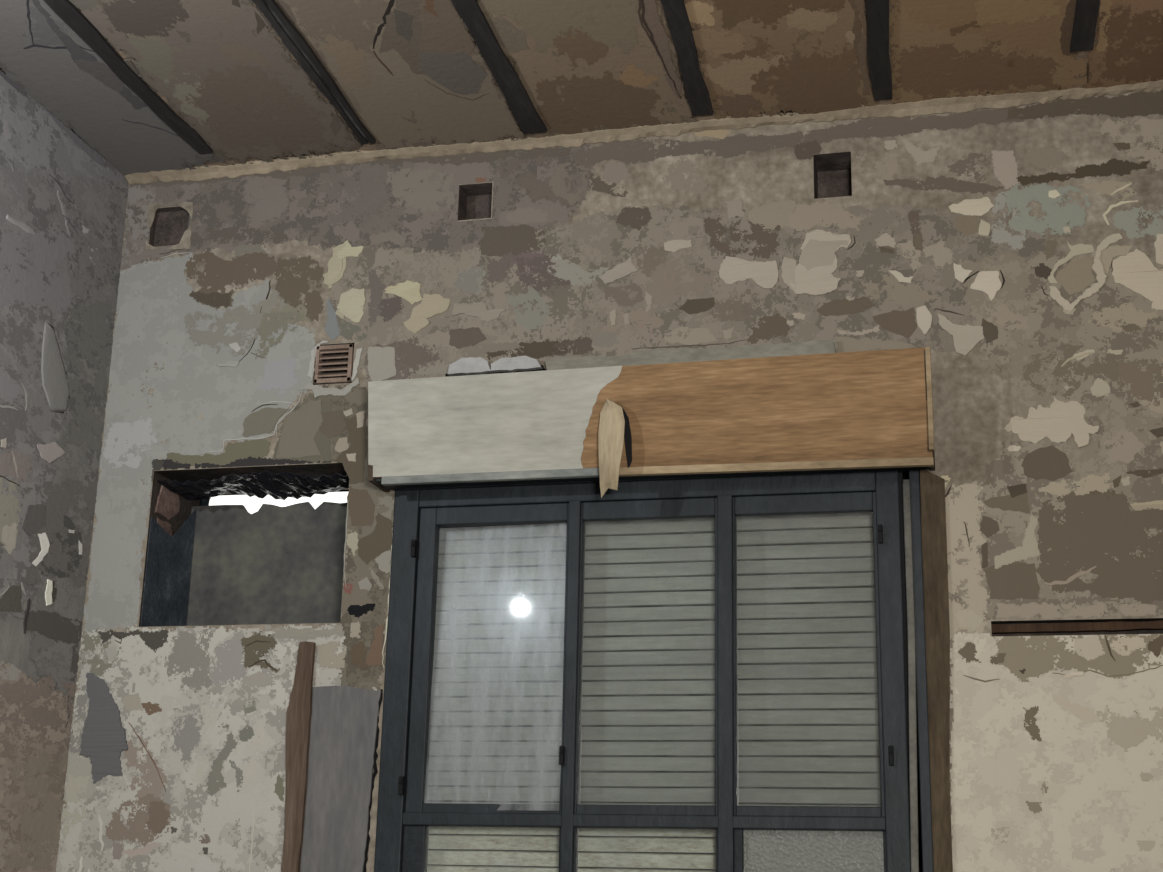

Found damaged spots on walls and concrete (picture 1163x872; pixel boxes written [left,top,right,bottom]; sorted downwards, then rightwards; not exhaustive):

crack [373,0,395,76]
spalling [379,0,487,95]
peeling [948,197,994,236]
peeling [323,230,406,323]
peeling [384,280,522,357]
peeling [664,297,734,345]
peeling [719,229,1002,356]
peeling [1048,226,1163,314]
spalling [166,341,397,591]
peeling [980,378,1110,600]
spalling [22,504,50,566]
peeling [45,579,53,605]